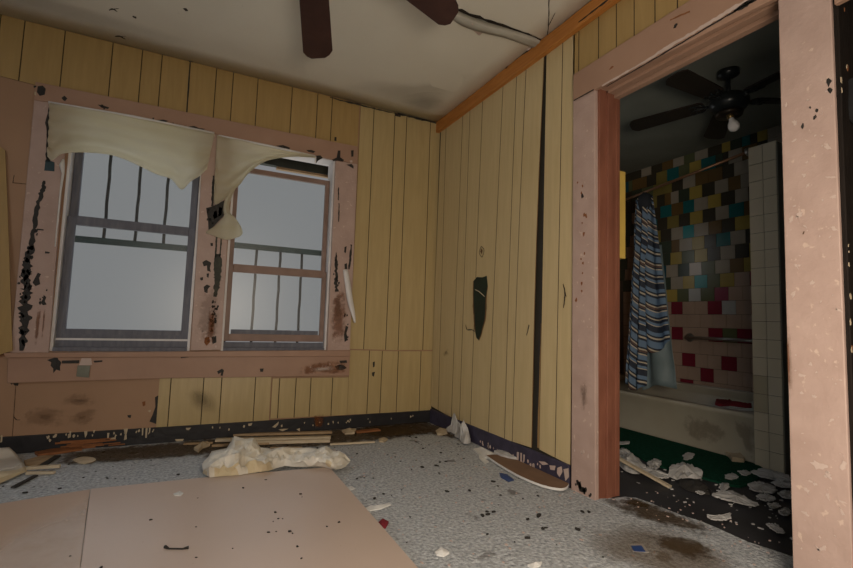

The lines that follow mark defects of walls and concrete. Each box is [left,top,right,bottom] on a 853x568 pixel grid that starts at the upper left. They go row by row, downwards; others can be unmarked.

peeling [44,108,55,171]
peeling [206,176,225,230]
peeling [17,181,47,351]
peeling [199,237,222,348]
hole [466,276,488,340]